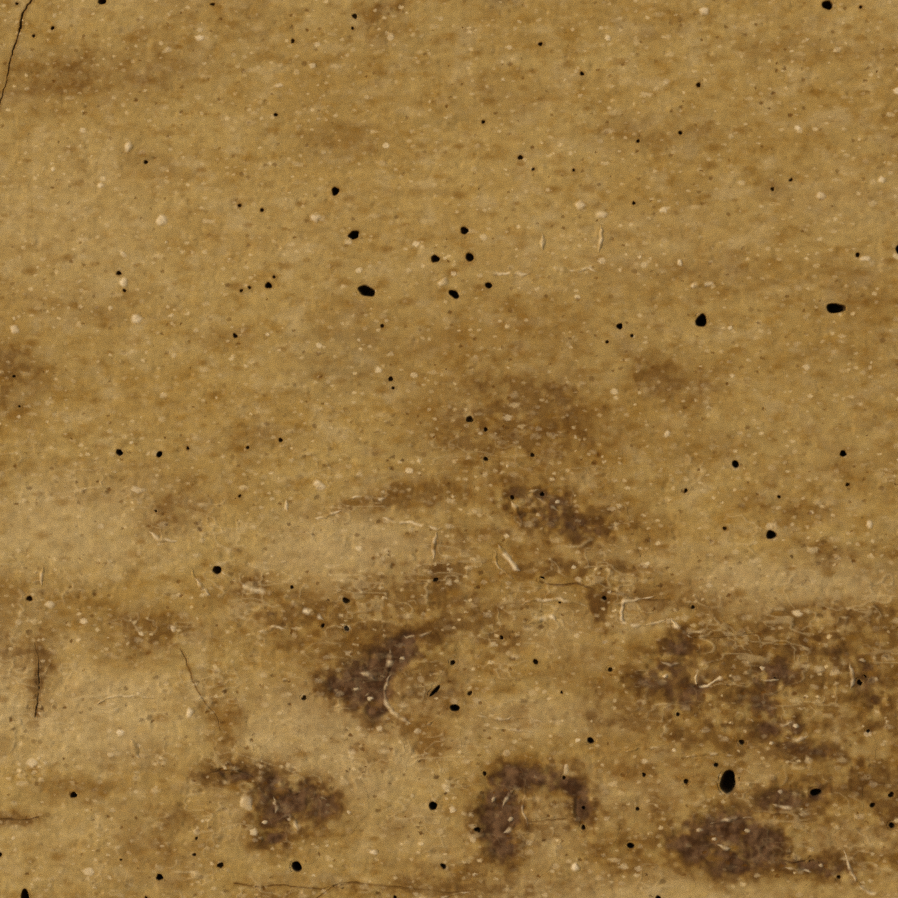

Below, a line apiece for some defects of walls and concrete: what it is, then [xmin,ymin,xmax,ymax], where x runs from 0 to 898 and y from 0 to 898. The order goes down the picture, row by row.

crack [0,0,35,112]
crack [0,814,39,823]